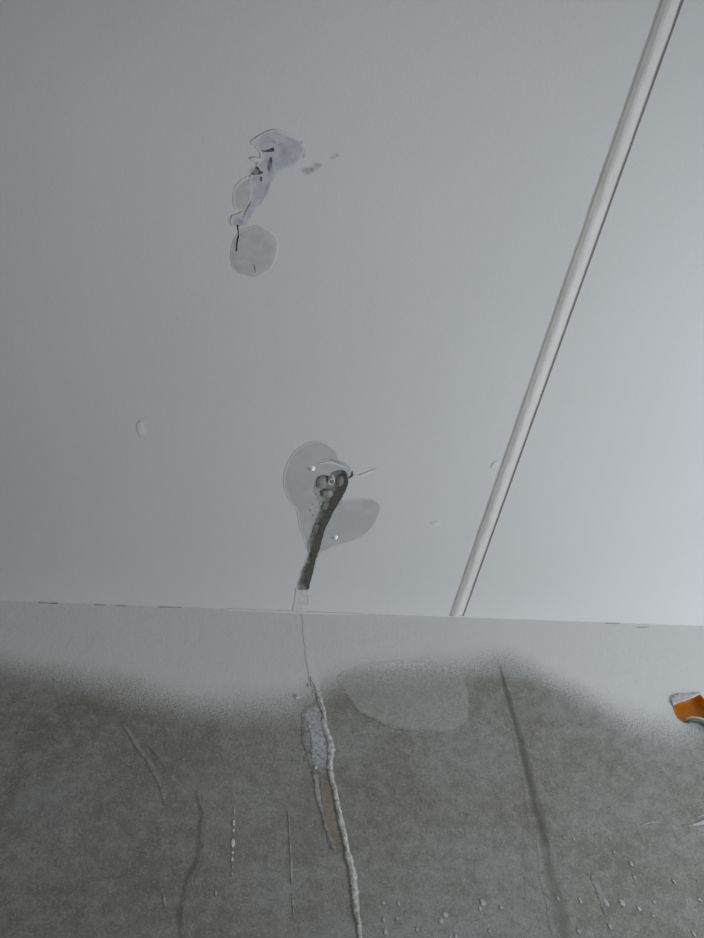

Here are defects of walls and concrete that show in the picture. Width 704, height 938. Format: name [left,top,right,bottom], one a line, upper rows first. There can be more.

spalling [250,148,274,181]
spalling [293,462,378,612]
crack [295,614,363,938]